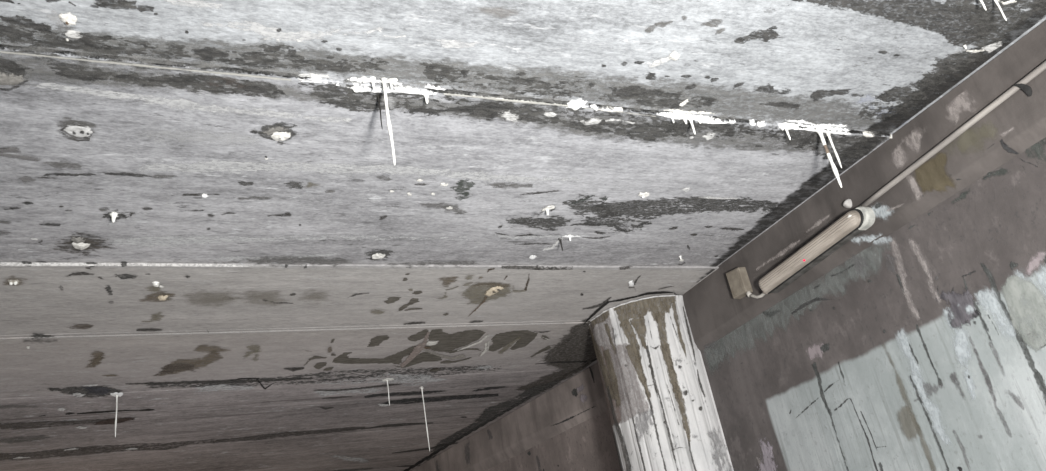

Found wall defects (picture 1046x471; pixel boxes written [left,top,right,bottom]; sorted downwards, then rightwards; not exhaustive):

spalling [0,72,29,91]
spalling [462,275,510,316]
damp [154,330,227,376]
peeling [296,329,551,372]